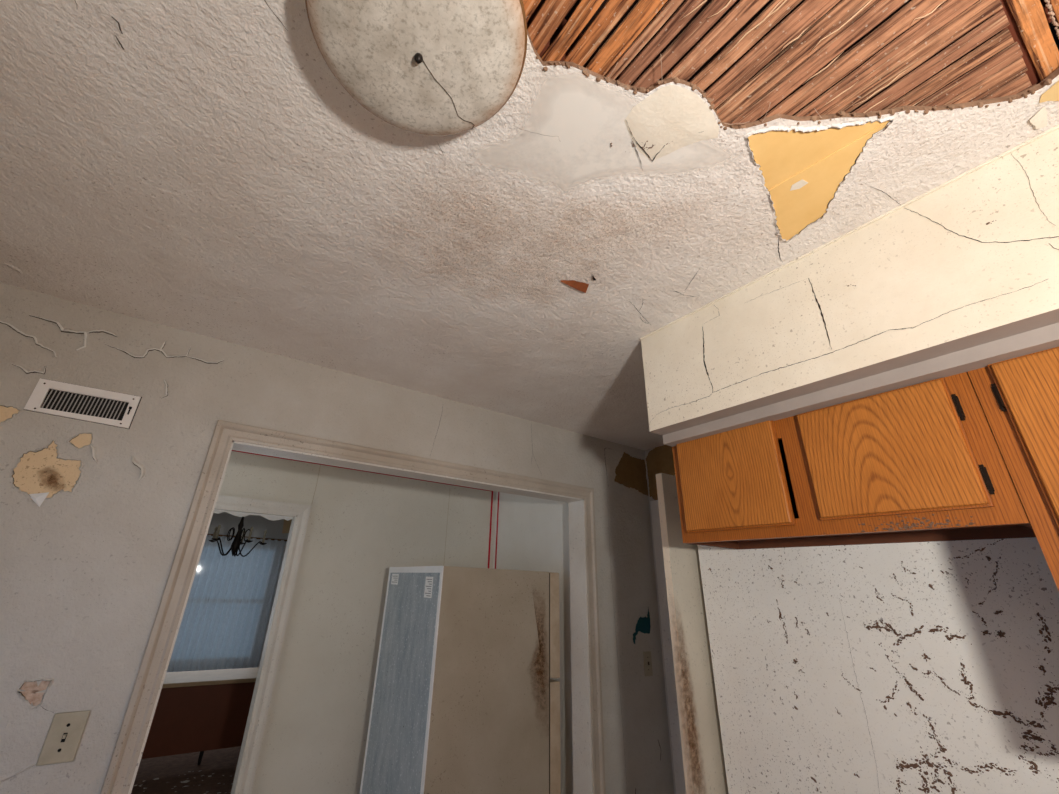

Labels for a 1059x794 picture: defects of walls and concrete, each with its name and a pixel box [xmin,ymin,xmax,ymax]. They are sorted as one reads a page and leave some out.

peeling [1030,81,1059,129]
peeling [744,116,895,243]
crack [869,167,1059,250]
crack [648,273,1045,427]
peeling [9,431,96,507]
peeling [613,445,675,500]
peeling [631,606,652,646]
peeling [15,677,56,710]